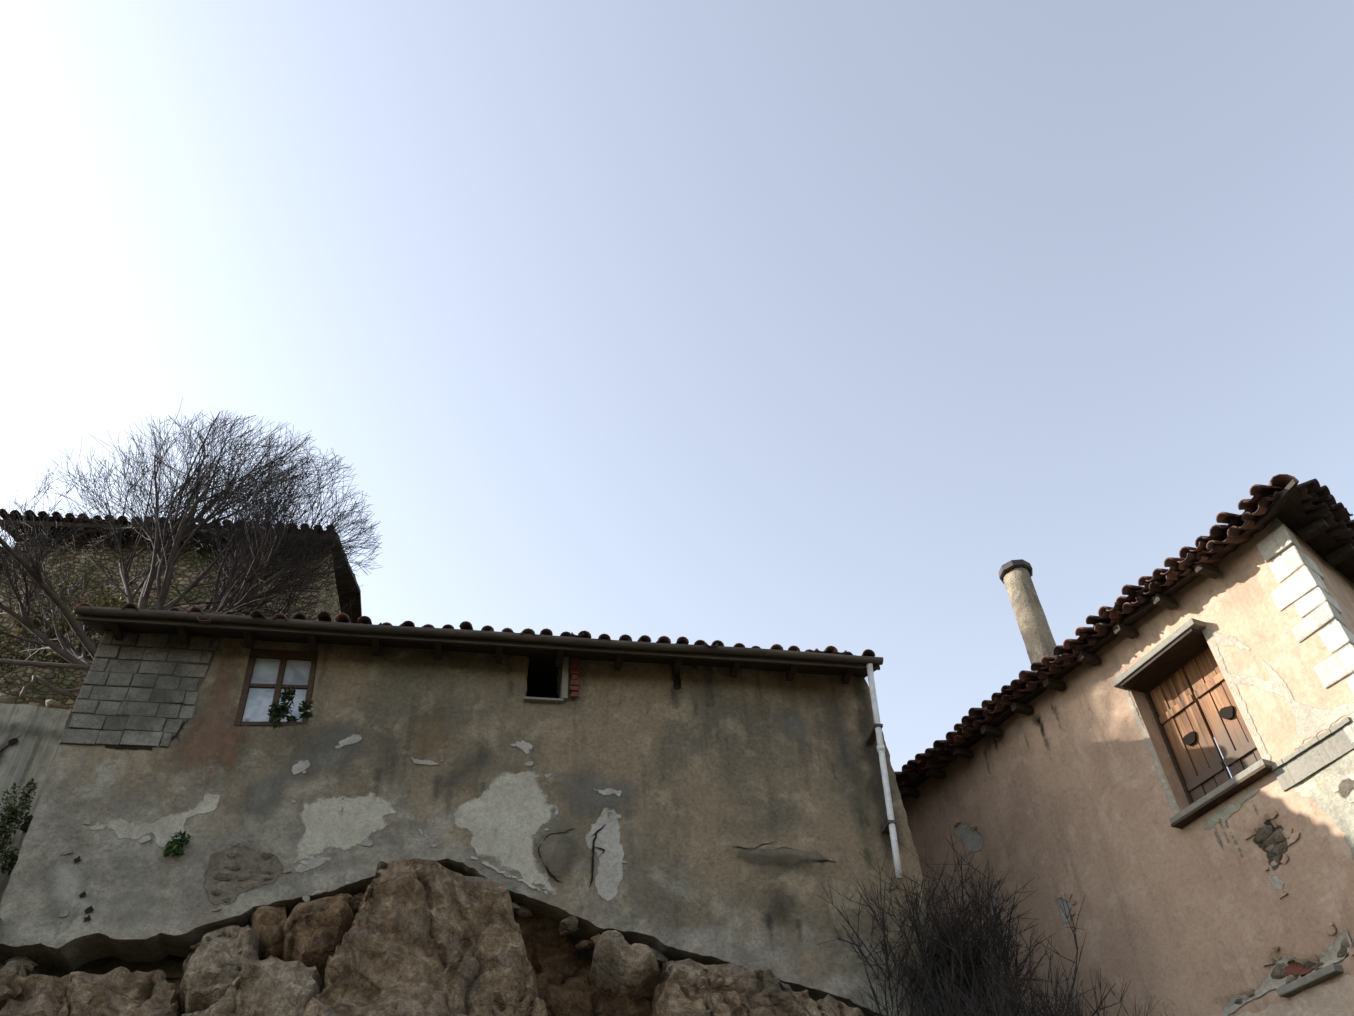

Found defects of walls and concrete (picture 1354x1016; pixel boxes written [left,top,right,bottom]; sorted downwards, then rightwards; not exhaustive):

spalling [335,734,362,749]
peeling [203,792,396,912]
peeling [453,740,558,894]
peeling [585,788,627,901]
spalling [1244,808,1301,871]
peeling [1293,749,1354,859]
spalling [1223,922,1354,1016]